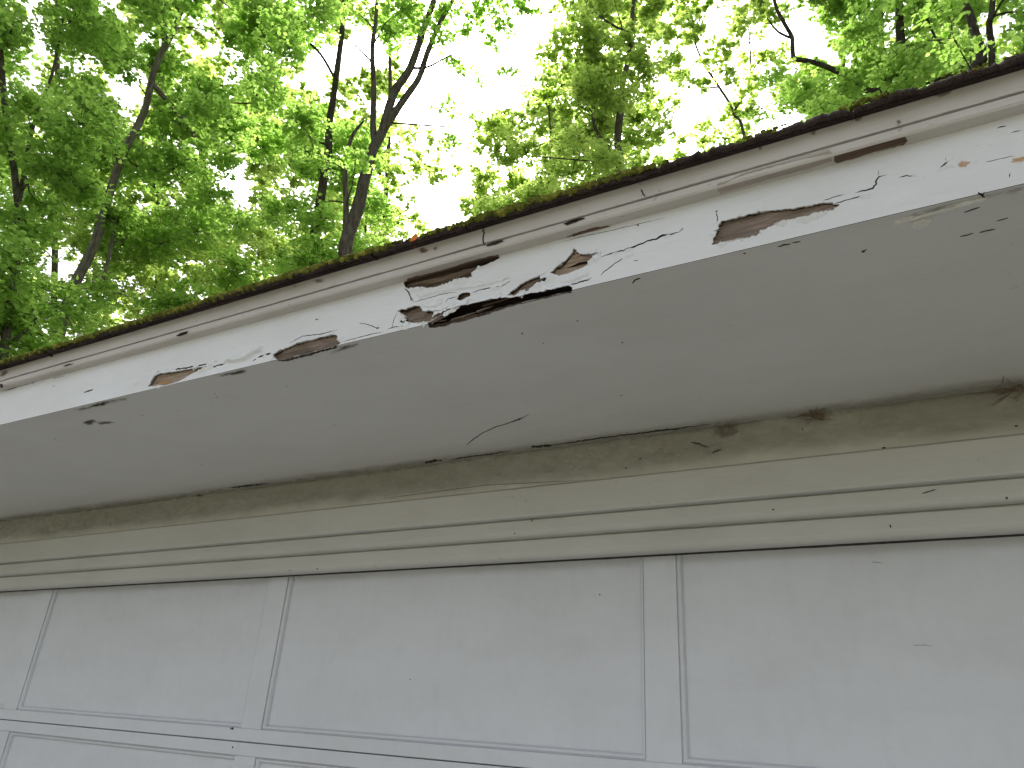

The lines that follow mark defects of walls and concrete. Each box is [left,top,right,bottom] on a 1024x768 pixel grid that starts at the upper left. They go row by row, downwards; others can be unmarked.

crack [823,157,956,203]
peeling [709,202,840,249]
crack [571,219,683,285]
peeling [397,248,601,327]
peeling [270,329,344,362]
peeling [148,360,215,389]
mould [779,381,1024,436]
crack [425,414,721,463]
crack [229,481,268,489]
mould [0,421,764,533]